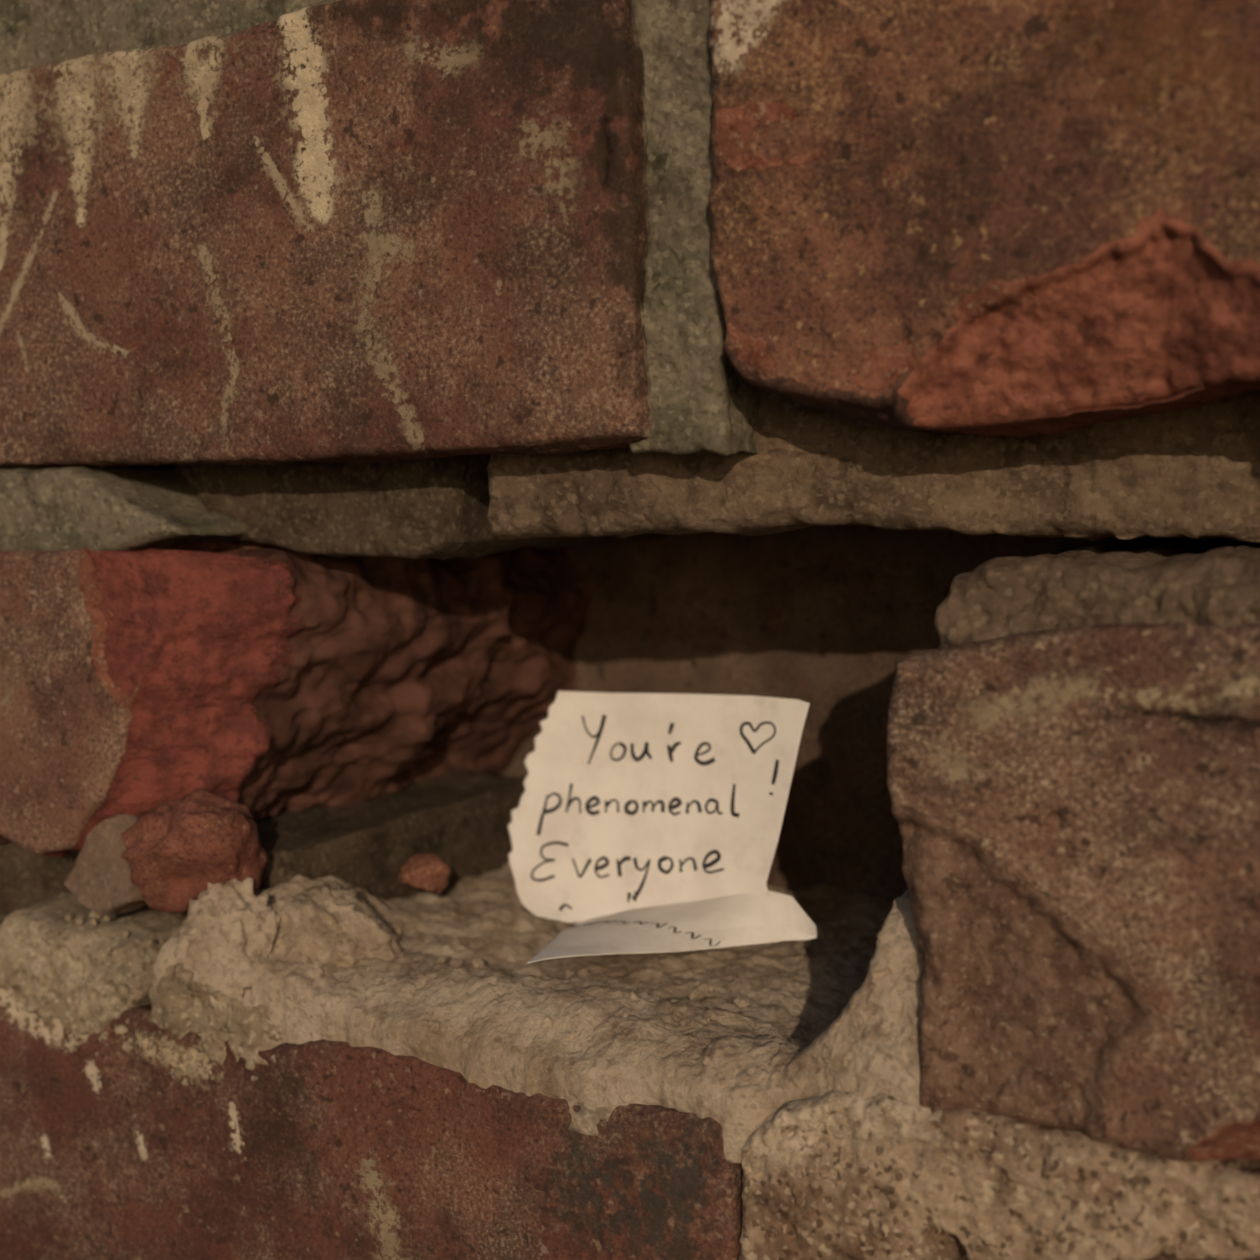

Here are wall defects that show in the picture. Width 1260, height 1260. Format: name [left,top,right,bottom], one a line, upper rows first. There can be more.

peeling [714,99,828,172]
spalling [723,209,1260,437]
spalling [184,541,268,556]
spalling [79,547,145,708]
crack [1117,707,1260,731]